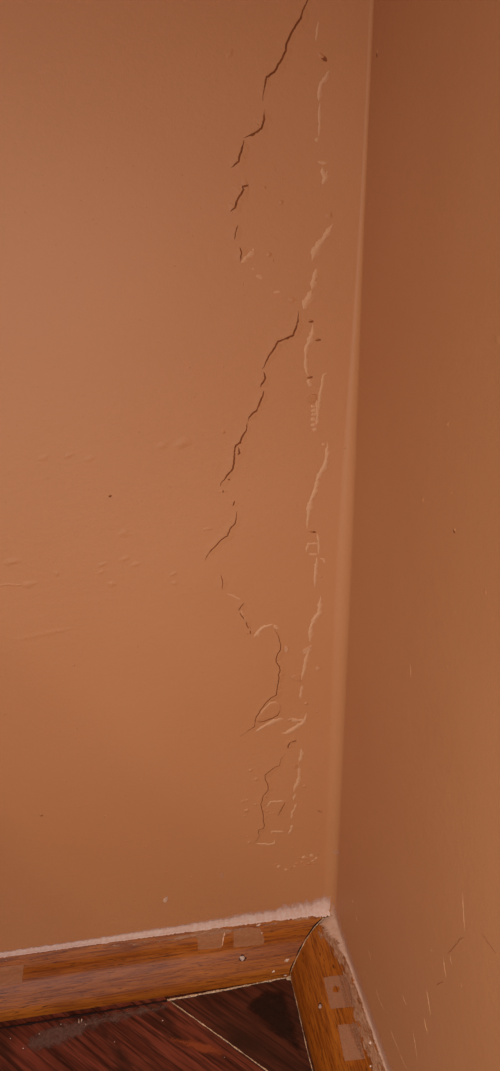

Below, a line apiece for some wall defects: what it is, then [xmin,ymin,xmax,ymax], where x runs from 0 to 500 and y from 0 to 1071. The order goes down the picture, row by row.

crack [226,0,311,214]
crack [202,311,304,561]